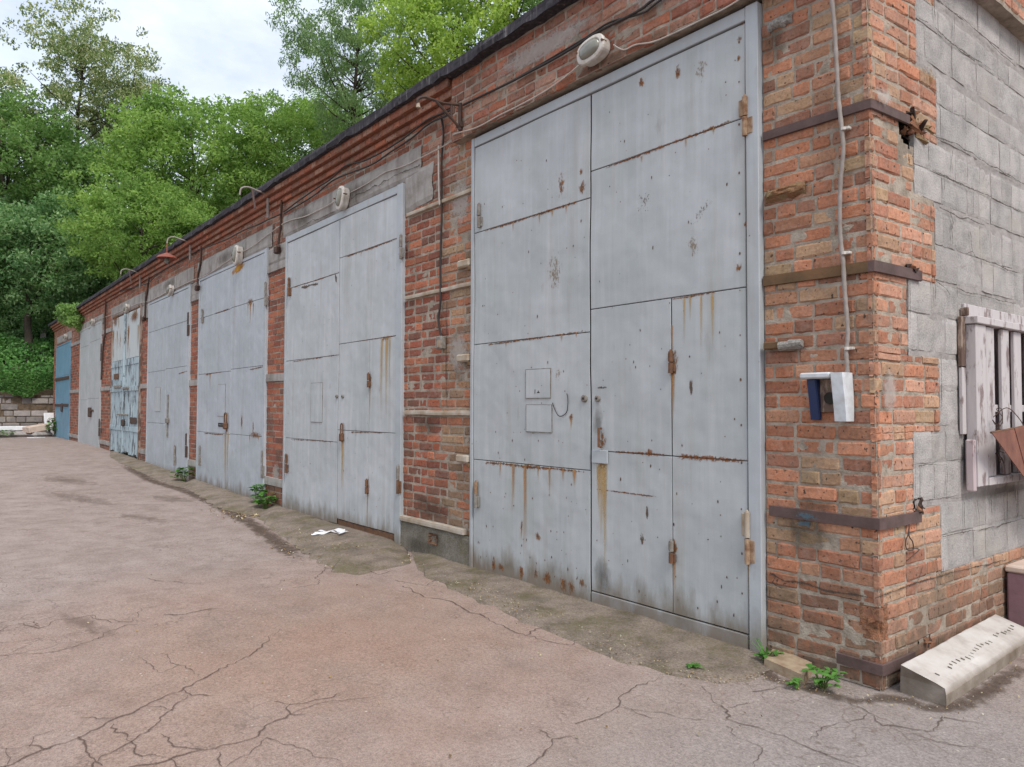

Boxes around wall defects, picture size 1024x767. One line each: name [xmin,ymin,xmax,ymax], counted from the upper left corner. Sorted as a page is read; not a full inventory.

rust [674,292,715,312]
rust [486,459,584,506]
rust [520,522,584,591]
crack [135,654,214,710]
crack [77,716,336,767]
crack [623,702,763,767]